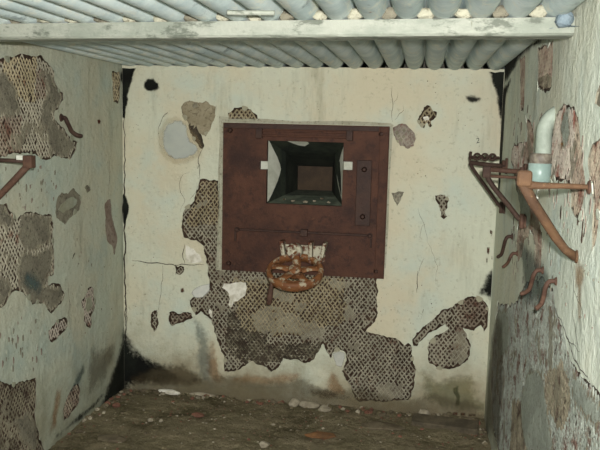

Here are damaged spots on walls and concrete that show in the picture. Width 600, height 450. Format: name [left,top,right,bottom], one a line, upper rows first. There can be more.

spalling [0,54,76,172]
spalling [181,101,216,149]
spalling [417,105,437,128]
spalling [511,57,534,176]
spalling [536,40,553,92]
spalling [545,104,600,246]
spalling [0,316,43,450]
spalling [0,170,90,313]
water stain [72,334,198,423]
crack [140,245,202,302]
spalling [169,179,600,450]
crack [554,262,590,382]